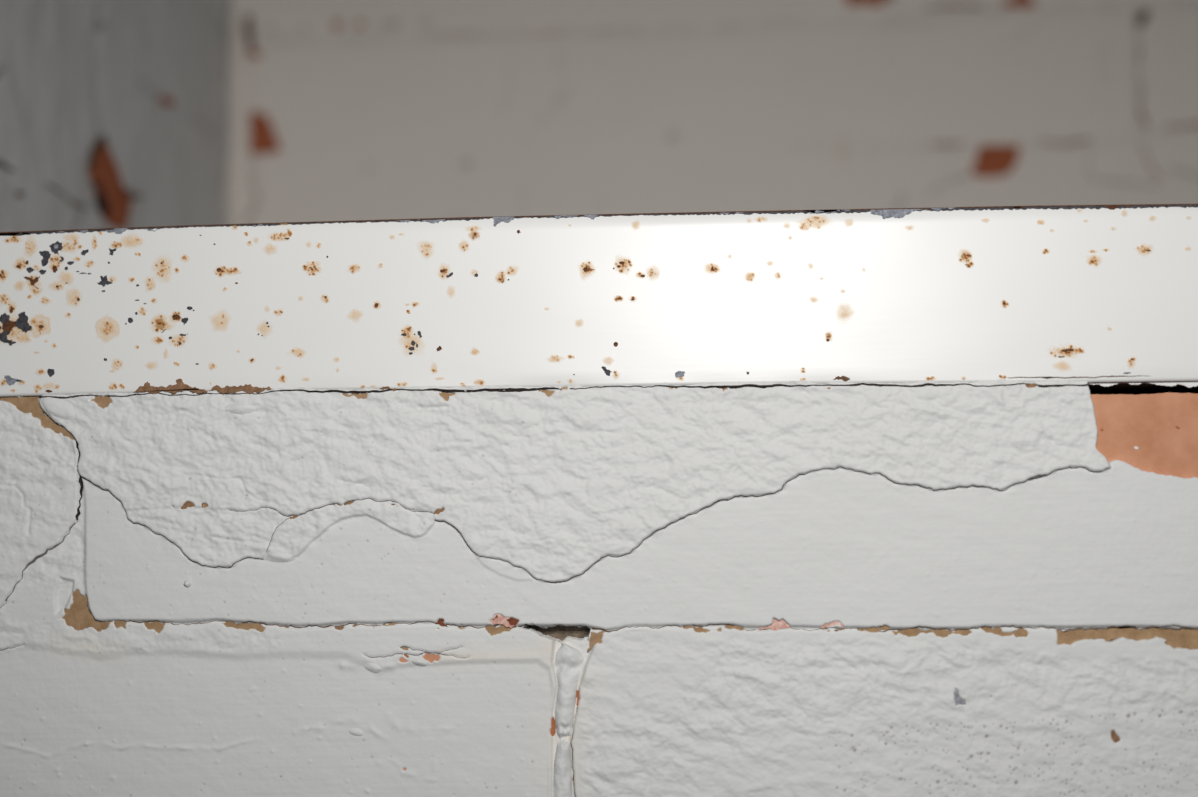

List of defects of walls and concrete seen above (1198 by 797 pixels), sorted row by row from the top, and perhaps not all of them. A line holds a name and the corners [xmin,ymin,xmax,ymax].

rust [0,232,141,316]
rust [613,259,656,277]
rust [0,295,46,346]
rust [101,255,195,346]
peeling [0,396,75,440]
spalling [1090,392,1198,478]
crack [0,375,1144,608]
peeling [62,589,126,632]
crack [87,604,543,658]
spalling [485,615,605,651]
crack [576,624,1191,632]
spalling [1057,627,1198,649]